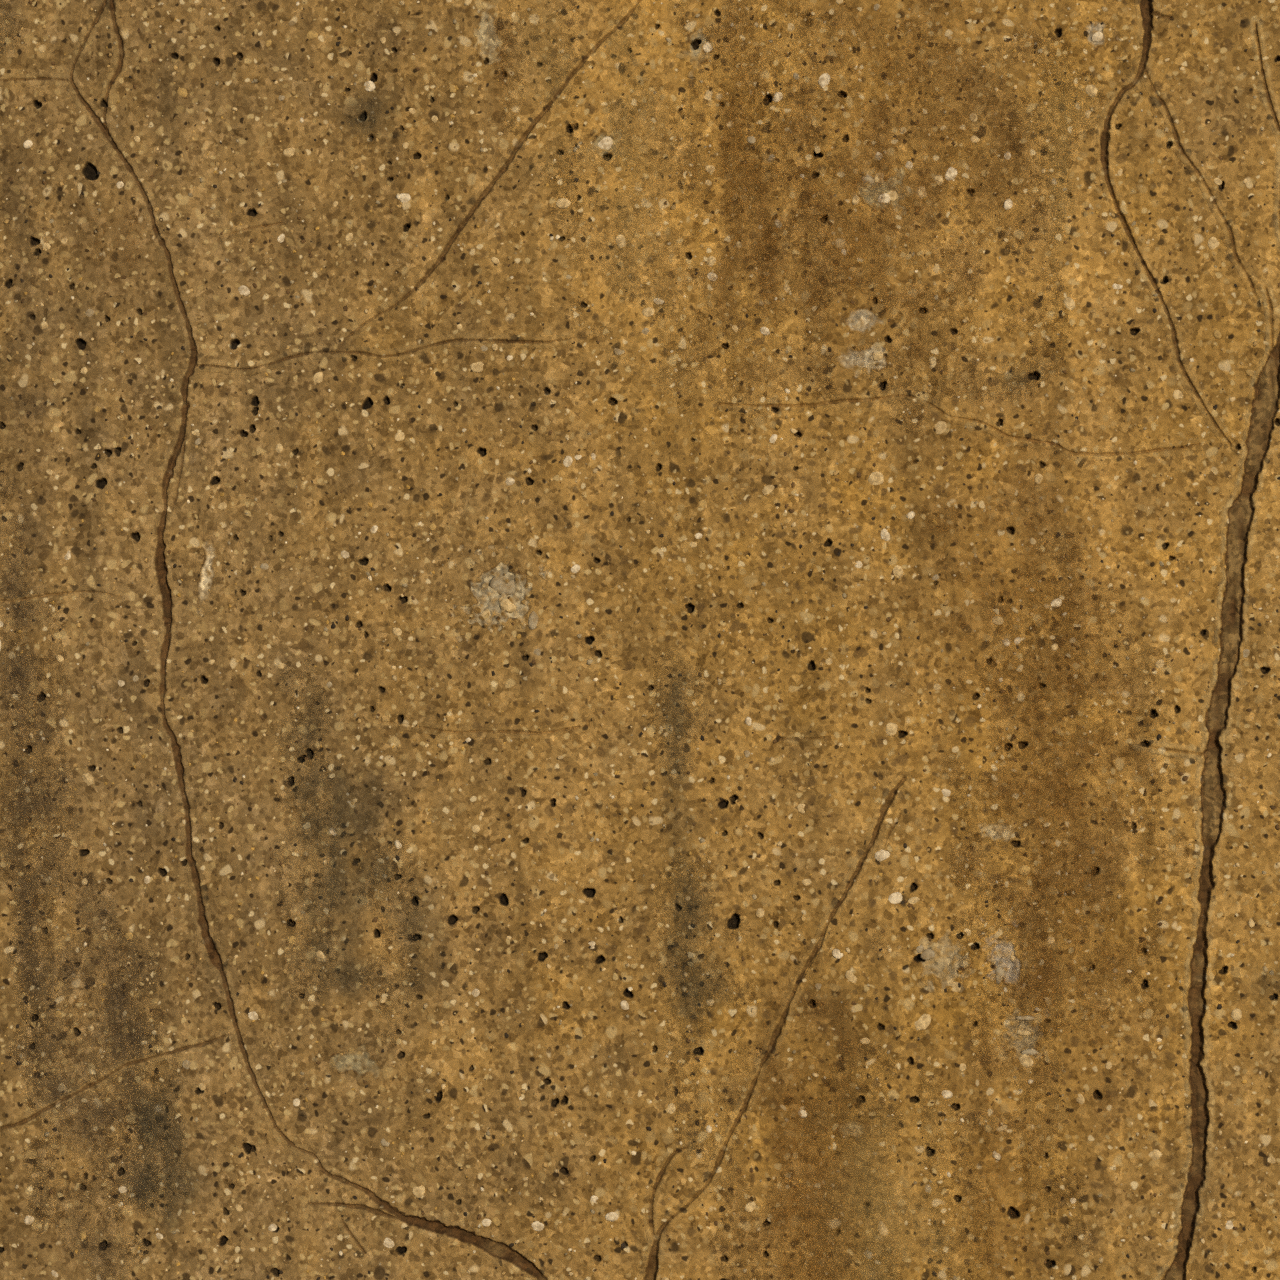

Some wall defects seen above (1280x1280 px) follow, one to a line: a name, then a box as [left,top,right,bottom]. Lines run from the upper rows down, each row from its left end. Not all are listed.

crack [0,0,649,1280]
crack [636,776,908,1280]
crack [716,0,1280,1280]